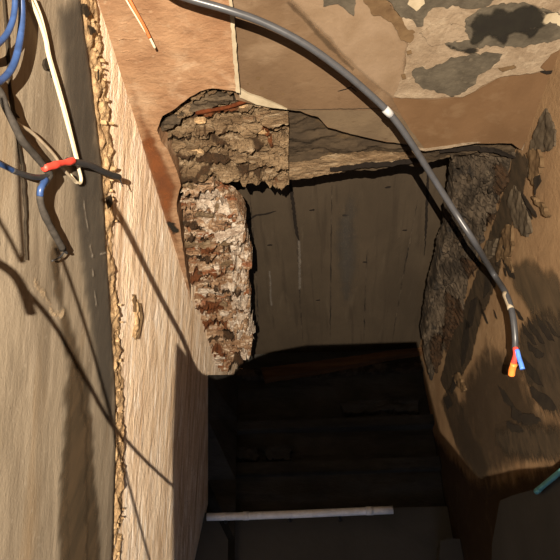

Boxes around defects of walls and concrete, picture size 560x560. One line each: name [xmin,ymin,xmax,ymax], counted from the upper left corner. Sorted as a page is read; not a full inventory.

flaking render [131,294,143,340]
spalling [159,0,560,410]